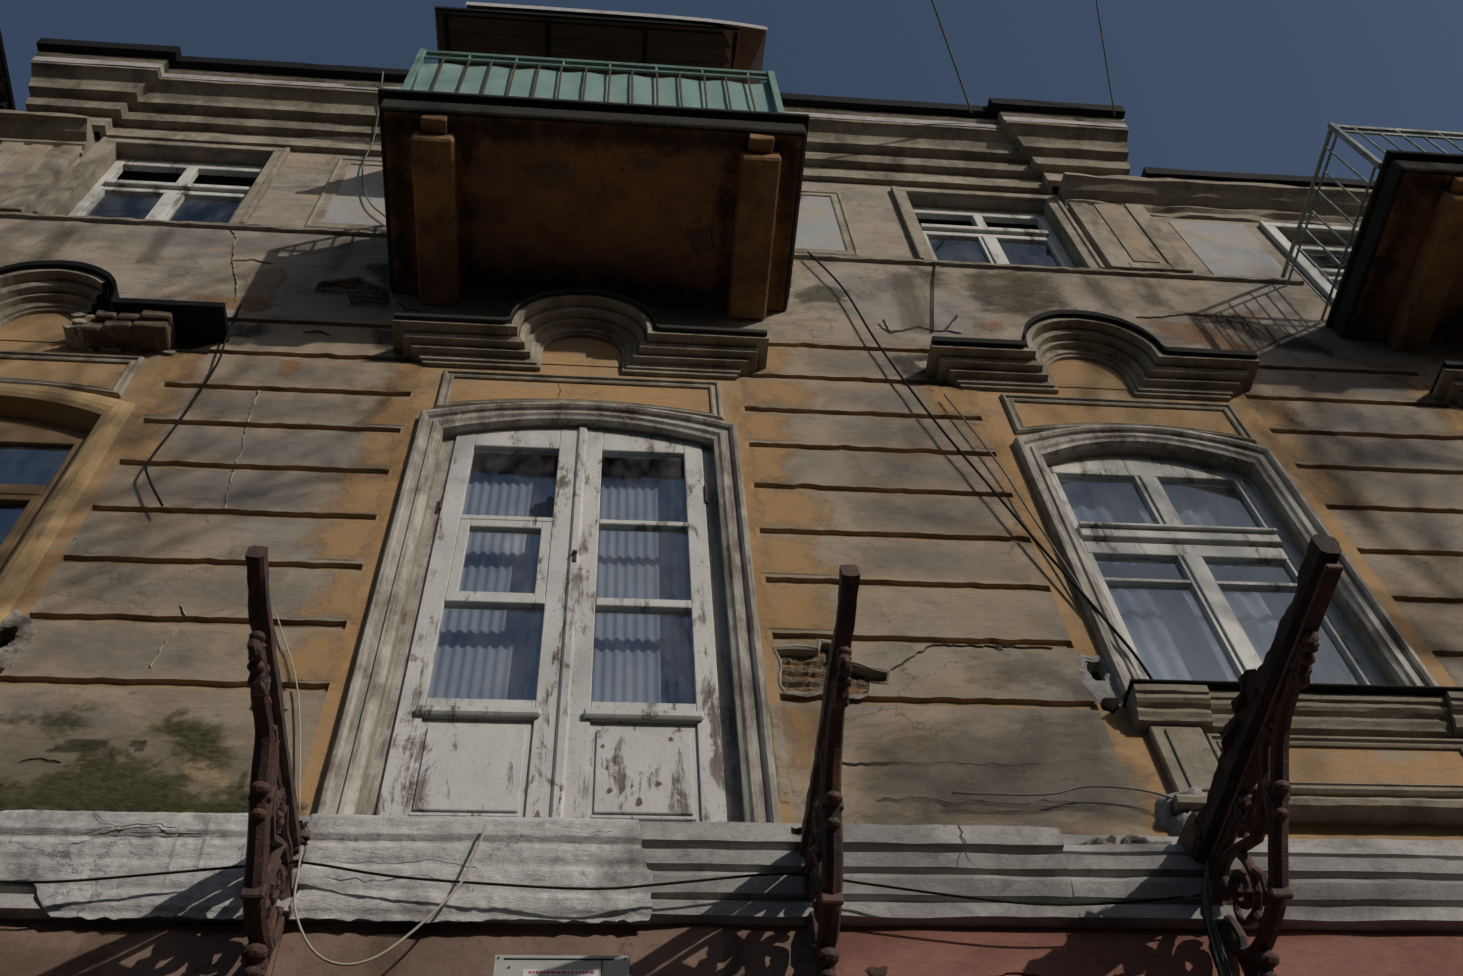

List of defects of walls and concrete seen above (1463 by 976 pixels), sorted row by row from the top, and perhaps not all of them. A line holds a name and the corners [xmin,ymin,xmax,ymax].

crack [231,230,273,303]
spalling [311,276,397,309]
spalling [62,310,214,356]
spalling [0,609,37,674]
spalling [772,639,831,697]
spalling [848,662,893,699]
spalling [1078,654,1120,714]
crack [999,968,1041,976]